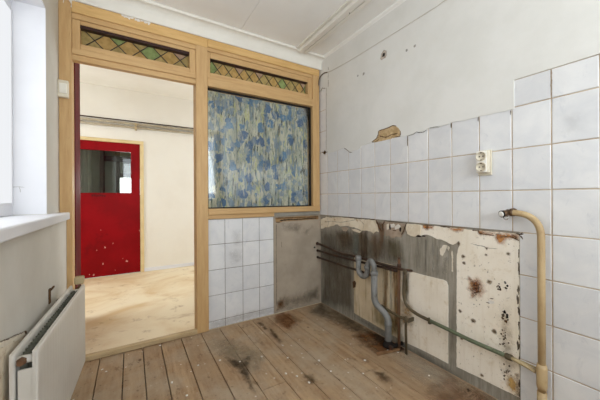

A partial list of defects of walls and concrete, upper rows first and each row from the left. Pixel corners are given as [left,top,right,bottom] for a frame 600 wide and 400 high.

flaking render [372,125,401,143]
flaking render [275,216,425,238]
corrosion [472,230,519,243]
leakage [314,233,404,352]
leakage [276,314,296,328]